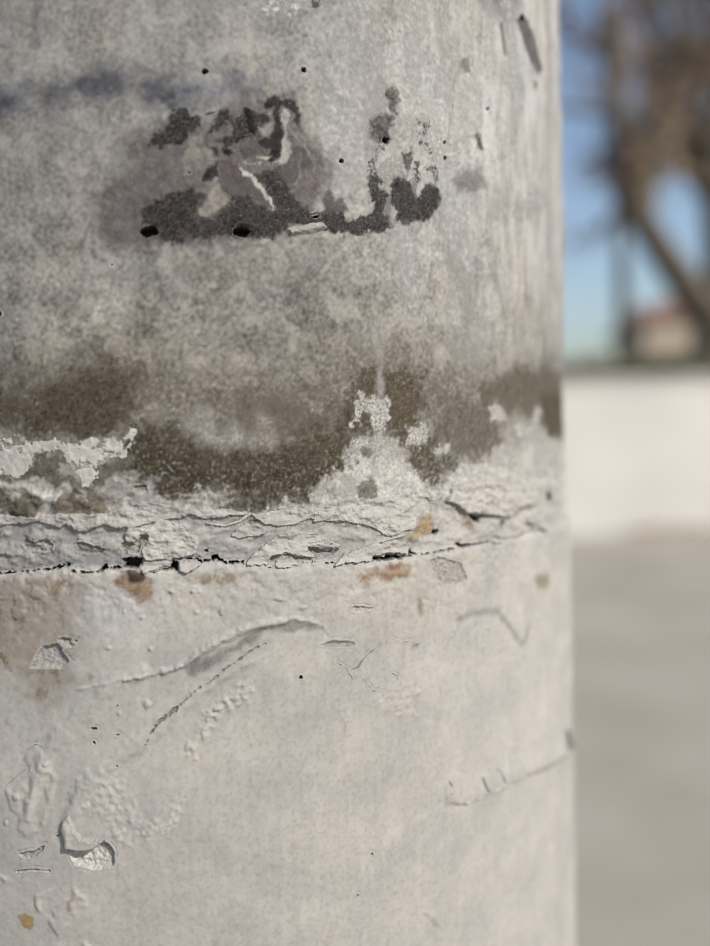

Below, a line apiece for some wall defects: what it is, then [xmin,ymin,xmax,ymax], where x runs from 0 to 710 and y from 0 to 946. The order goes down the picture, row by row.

water stain [101,0,485,359]
water stain [495,0,553,332]
water stain [0,316,563,529]
corrosion [115,570,152,602]
peeling [0,482,430,574]
crack [0,497,549,579]
spalling [429,526,441,538]
spalling [426,554,470,589]
peeling [442,480,554,529]
spalling [27,634,82,672]
peeling [14,764,148,876]